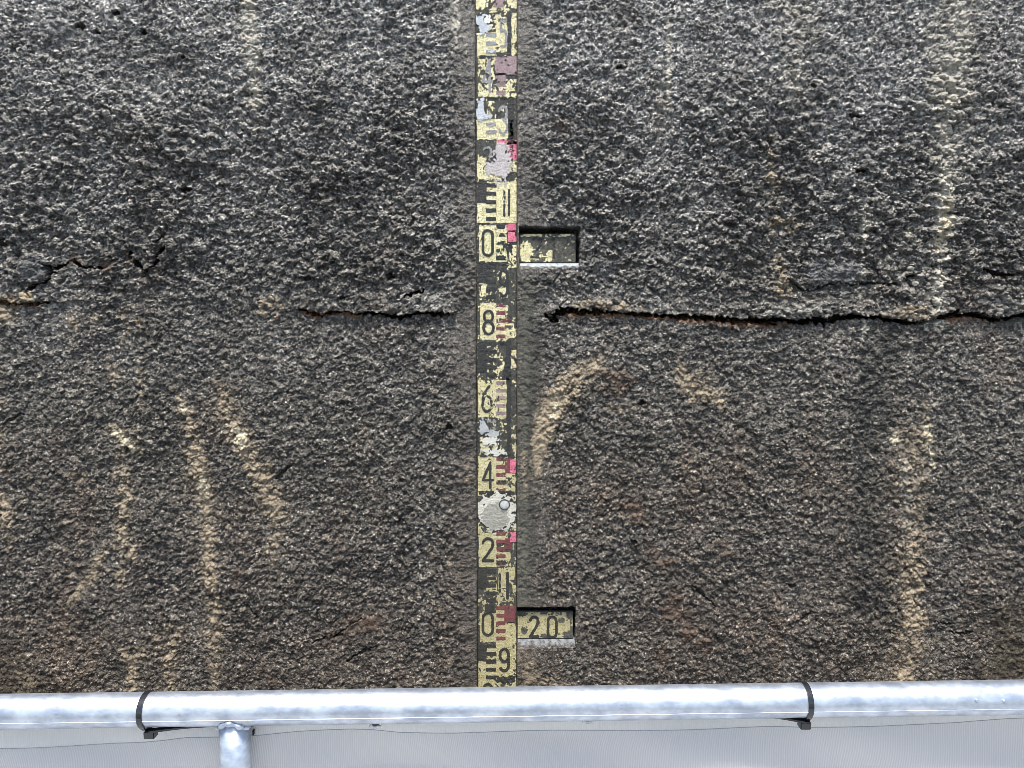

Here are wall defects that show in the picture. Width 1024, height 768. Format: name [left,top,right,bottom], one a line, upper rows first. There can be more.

crack [0,255,104,307]
crack [128,235,170,277]
crack [793,271,922,292]
crack [983,269,1019,280]
crack [299,288,450,321]
crack [544,306,1024,328]
leakage [214,381,286,560]
leakage [67,424,143,606]
leakage [171,388,222,691]
leakage [118,649,145,692]
leakage [156,624,183,691]